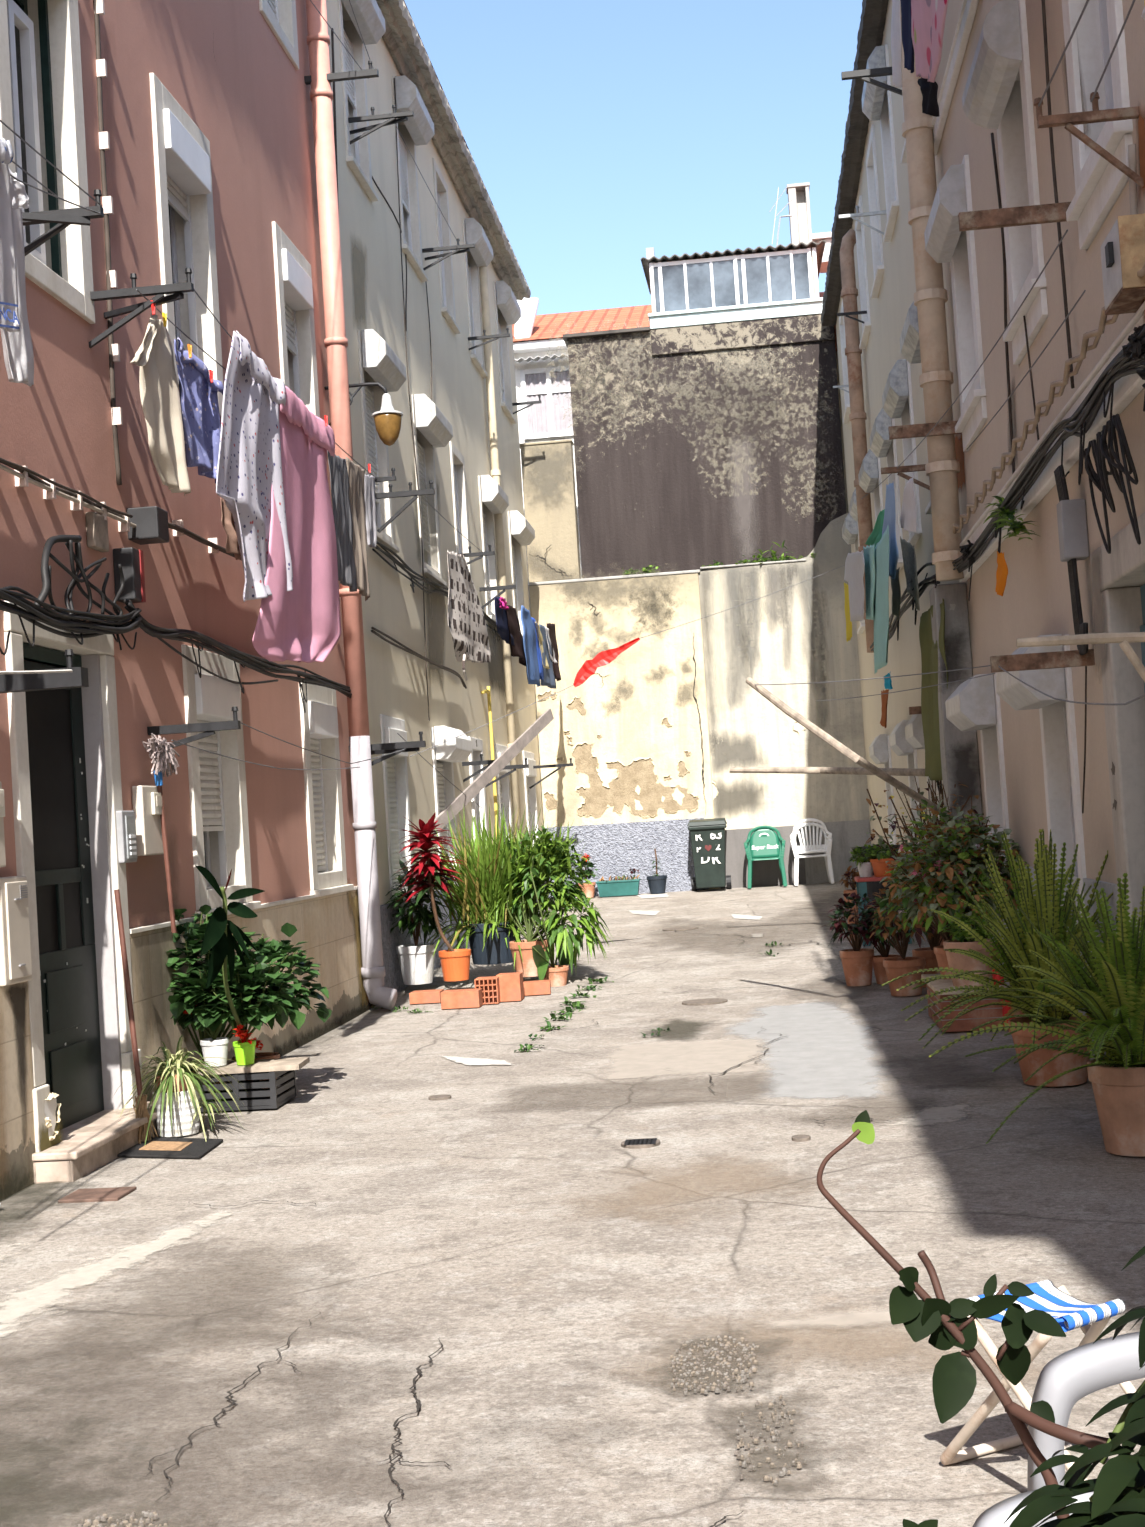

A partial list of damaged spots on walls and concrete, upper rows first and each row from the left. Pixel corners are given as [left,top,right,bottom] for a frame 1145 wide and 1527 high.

peeling [537,691,586,715]
peeling [556,730,718,819]
leakage [8,985,62,1152]
leakage [0,1172,33,1202]
crack [140,1312,321,1502]
crack [380,1337,450,1527]